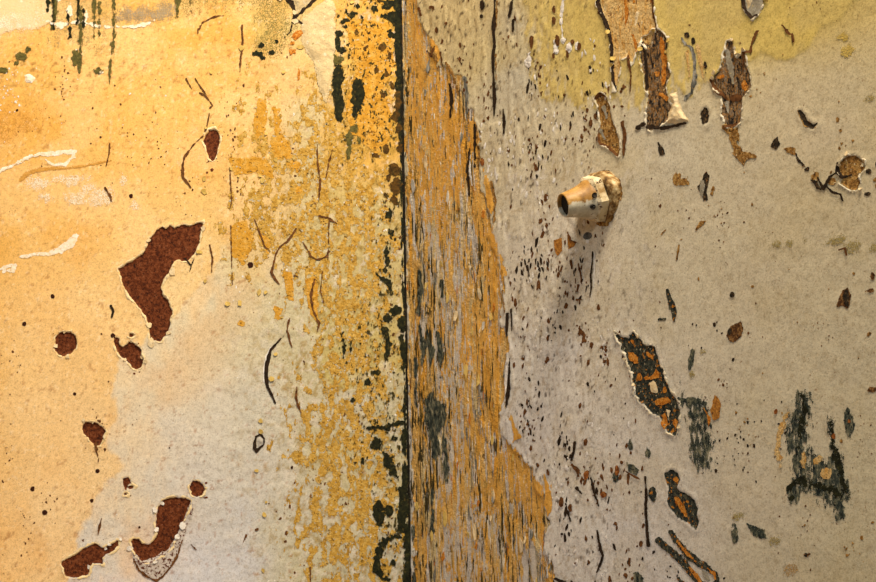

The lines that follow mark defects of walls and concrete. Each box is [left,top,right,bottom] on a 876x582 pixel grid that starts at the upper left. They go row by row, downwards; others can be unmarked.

water stain [0,0,303,84]
peeling [101,0,768,582]
flaking render [60,479,208,582]